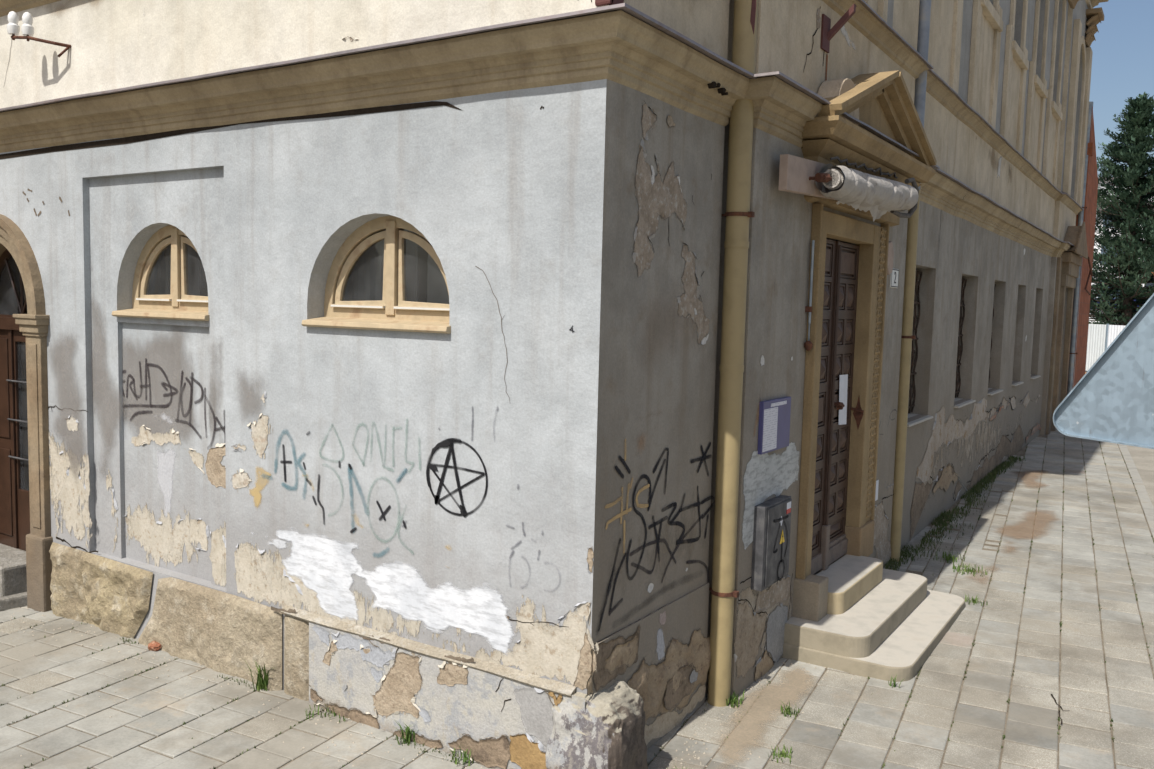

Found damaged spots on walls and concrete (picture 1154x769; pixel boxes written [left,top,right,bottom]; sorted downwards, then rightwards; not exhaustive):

crack [475,266,510,401]
peeling [48,415,92,548]
flaking render [131,391,273,491]
flaking render [910,391,1041,541]
peeling [106,469,711,769]
flaking render [734,575,792,681]